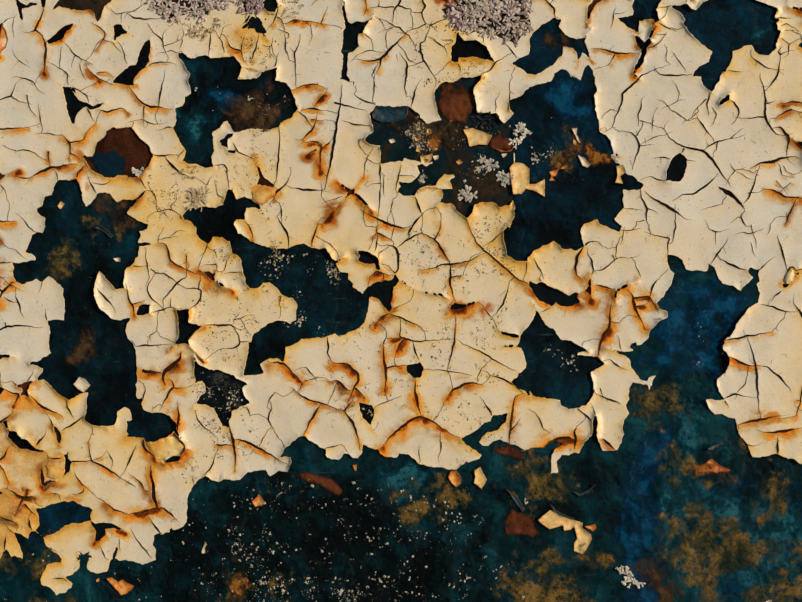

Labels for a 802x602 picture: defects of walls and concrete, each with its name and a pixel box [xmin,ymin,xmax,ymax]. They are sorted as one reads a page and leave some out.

crack [0,368,180,560]
crack [0,0,184,330]
peeling [13,179,179,442]
peeling [183,189,406,427]
corrosion [300,119,377,232]
corrosion [326,360,369,405]
peeling [0,255,802,602]
corrosion [375,333,462,457]
peeling [365,18,643,261]
corrosion [525,273,659,359]
crack [573,0,802,454]
peeling [672,0,781,92]